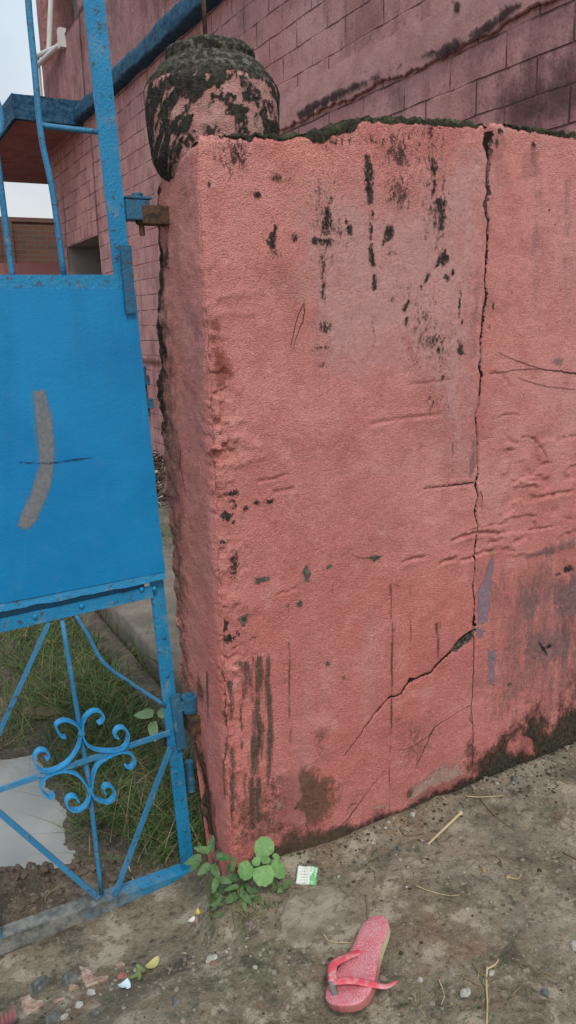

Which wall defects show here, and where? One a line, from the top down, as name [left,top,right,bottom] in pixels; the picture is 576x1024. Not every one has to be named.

water stain [143,34,280,186]
water stain [266,220,282,258]
water stain [291,171,353,303]
water stain [325,125,465,379]
crack [345,131,576,768]
water stain [221,655,576,874]